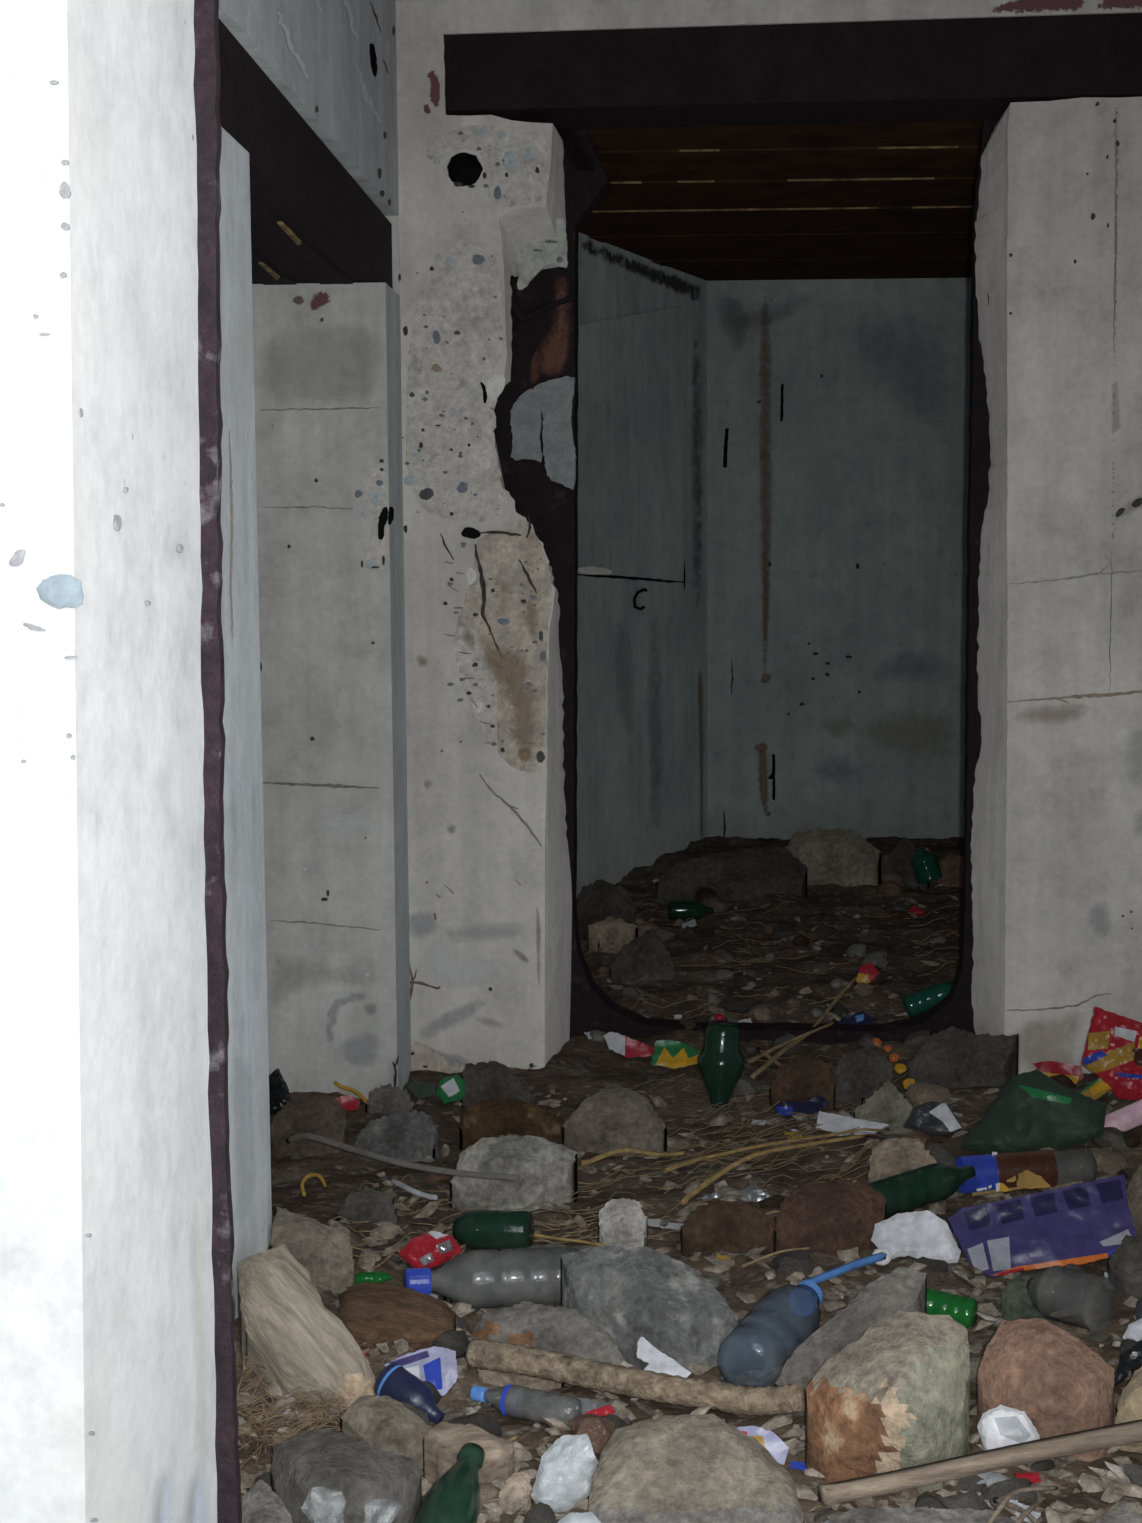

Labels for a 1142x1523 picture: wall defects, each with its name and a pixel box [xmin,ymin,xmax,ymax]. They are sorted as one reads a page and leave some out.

spalling [425,125,549,208]
spalling [355,218,576,773]
corrosion [531,278,569,382]
corrosion [761,319,770,640]
crack [440,516,542,846]
corrosion [755,744,770,816]